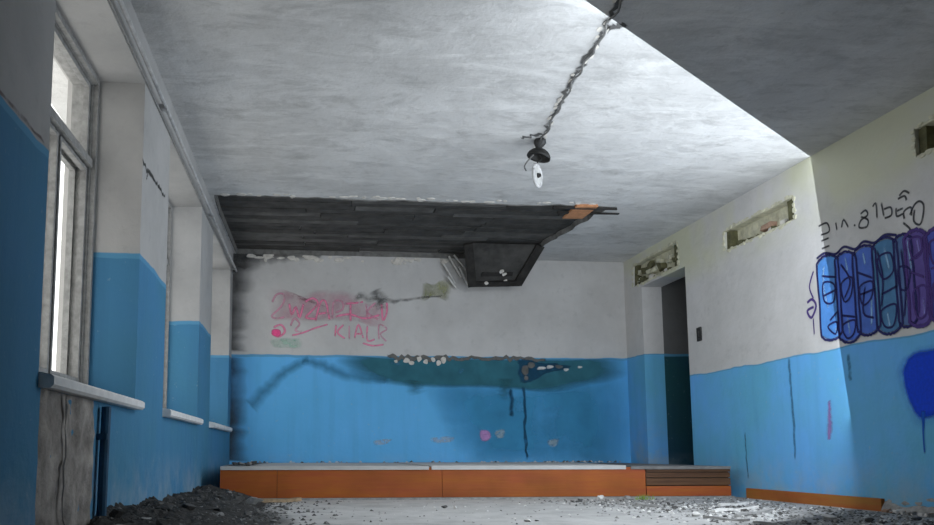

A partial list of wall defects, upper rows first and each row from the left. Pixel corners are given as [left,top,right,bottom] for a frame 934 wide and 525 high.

crack [143,161,165,197]
spalling [722,195,797,252]
peeling [388,354,582,383]
leakage [353,357,611,457]
spalling [881,498,934,517]